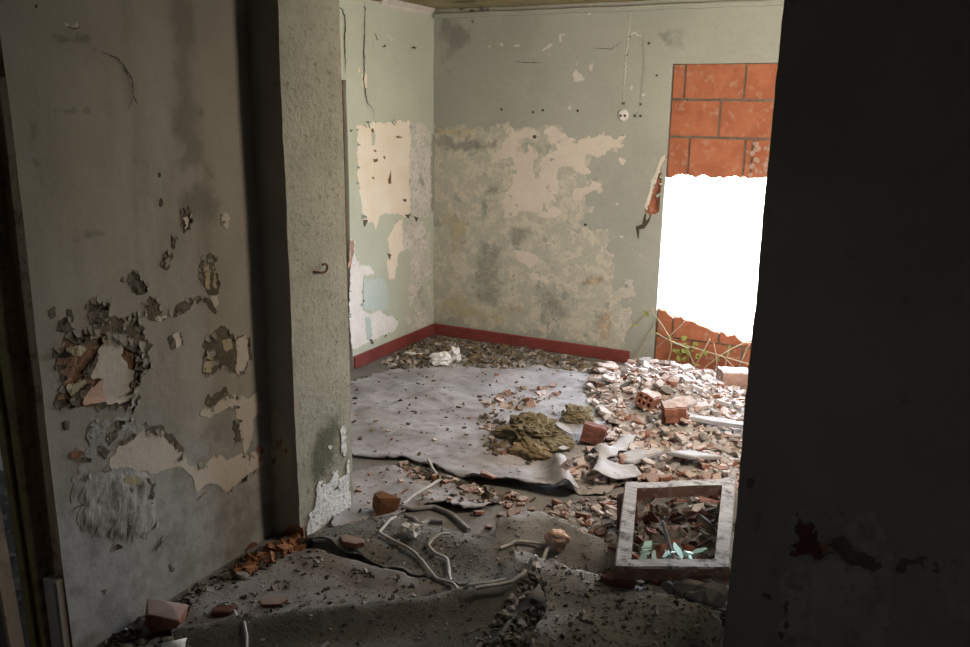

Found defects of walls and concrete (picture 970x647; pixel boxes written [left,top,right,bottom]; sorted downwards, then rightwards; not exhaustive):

crack [103,52,138,105]
peeling [160,206,194,271]
peeling [347,119,636,349]
spalling [636,155,667,239]
spalling [48,253,263,501]